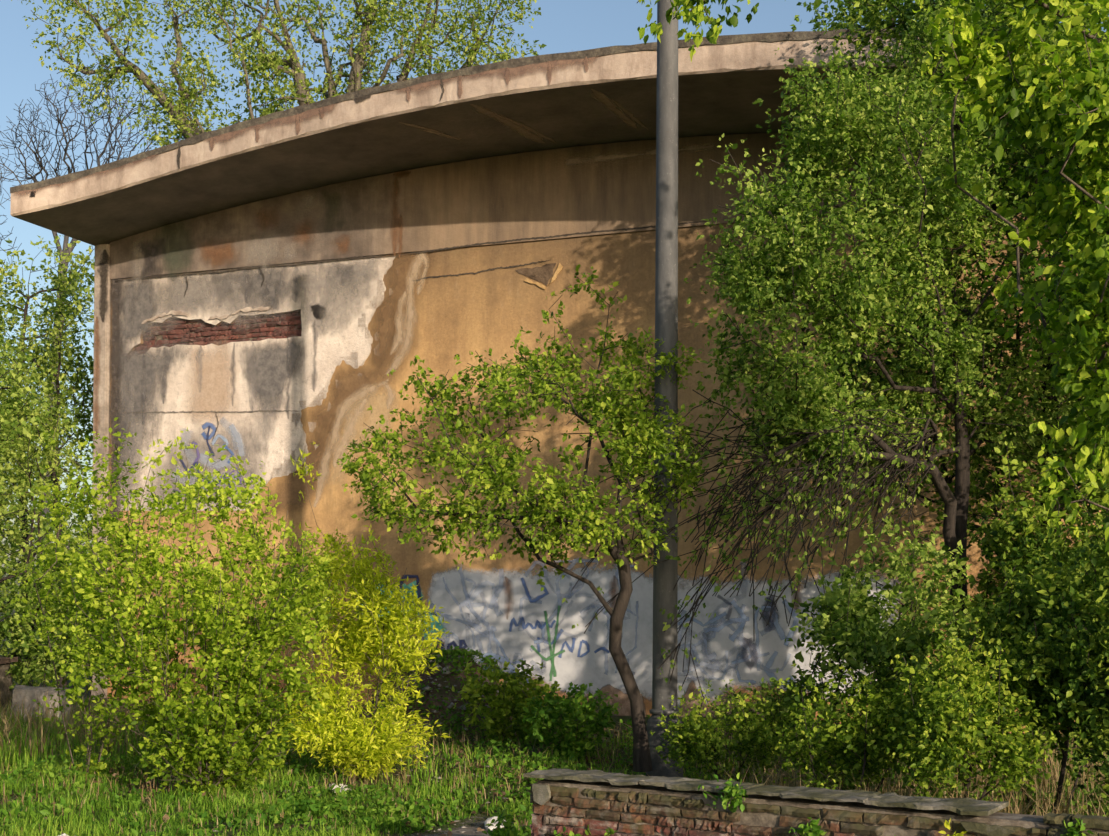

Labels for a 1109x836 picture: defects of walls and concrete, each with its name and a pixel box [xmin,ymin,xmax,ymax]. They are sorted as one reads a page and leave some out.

leakage [118,241,375,500]
peeling [118,256,396,511]
leakage [274,251,427,511]
spalling [515,263,563,290]